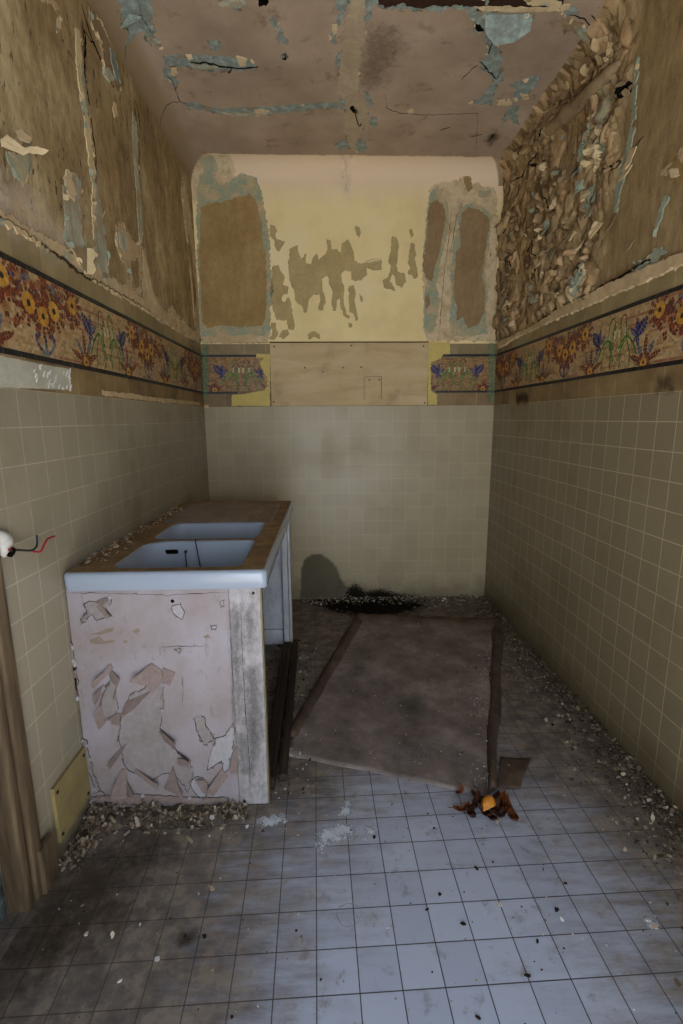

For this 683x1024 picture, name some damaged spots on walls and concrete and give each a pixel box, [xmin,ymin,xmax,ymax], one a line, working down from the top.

crack [190,62,258,73]
spalling [0,0,683,406]
leakage [301,554,346,598]